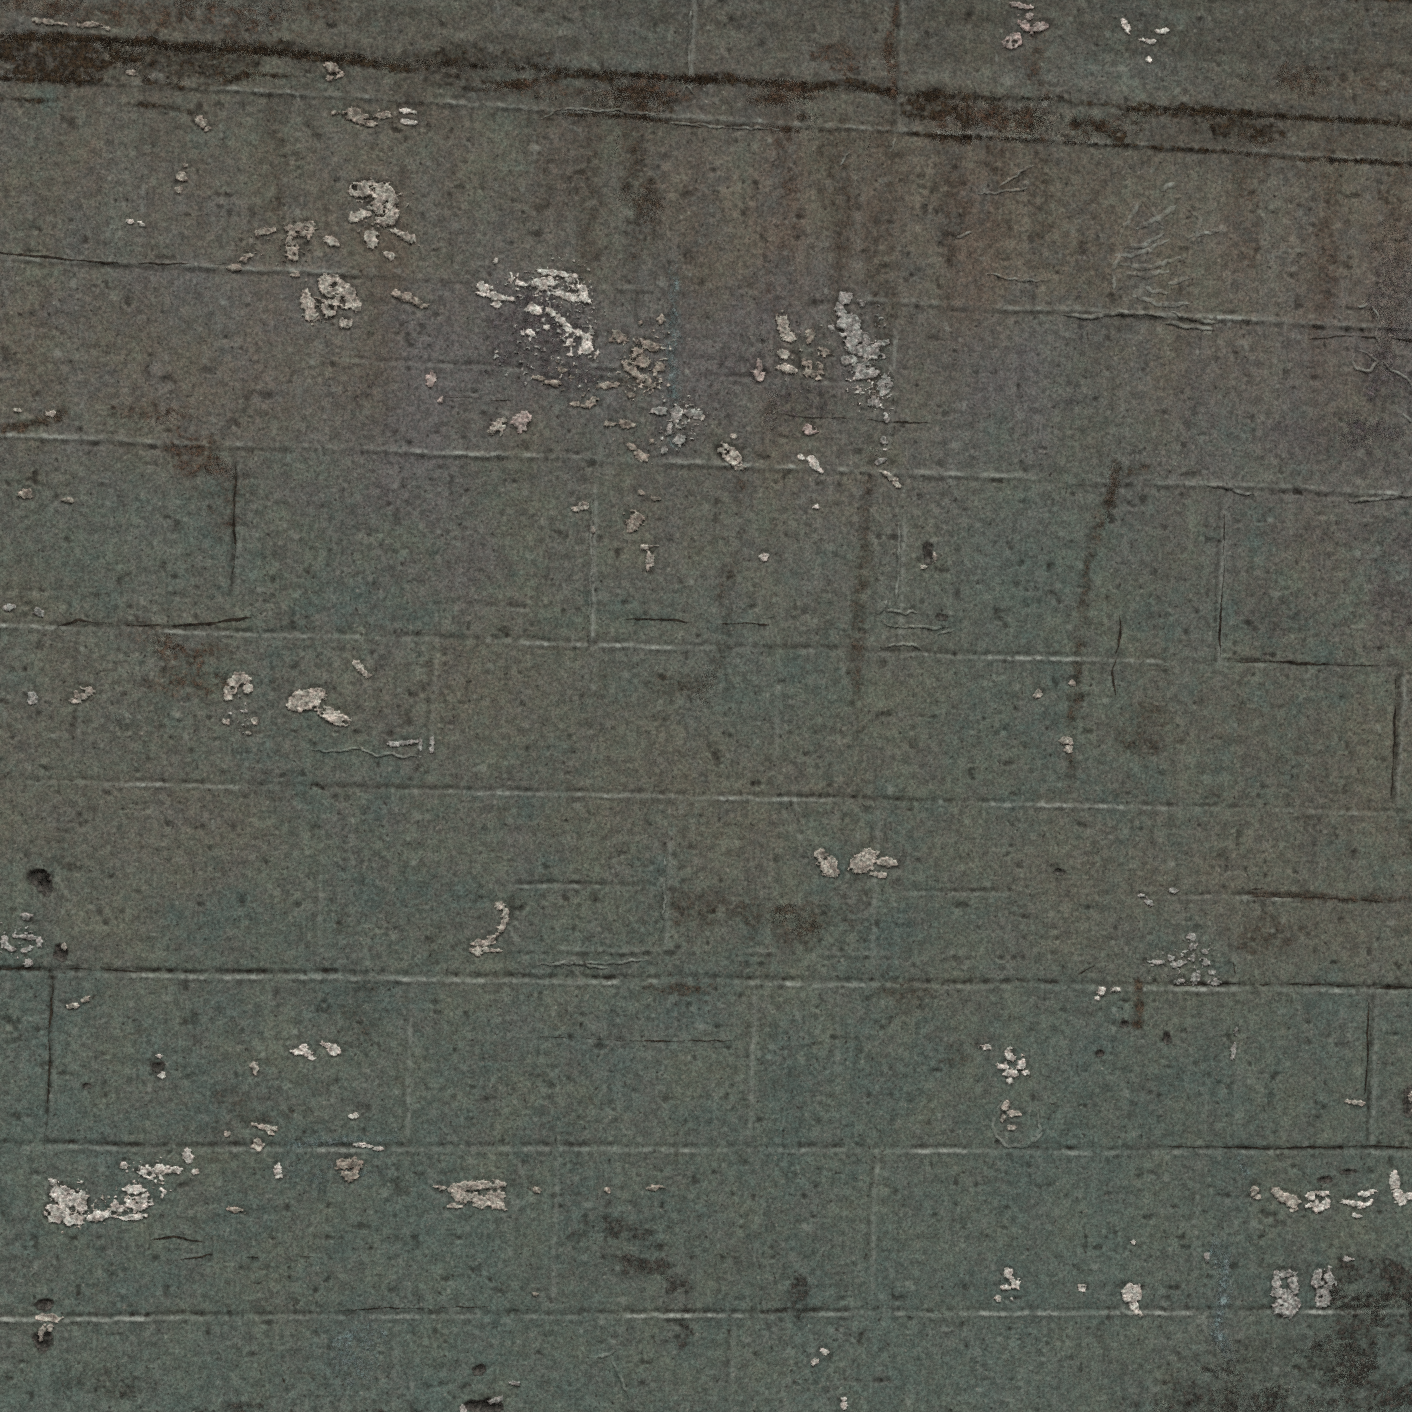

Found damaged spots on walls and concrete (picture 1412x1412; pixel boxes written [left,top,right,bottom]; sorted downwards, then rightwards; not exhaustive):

peeling [348,171,420,261]
peeling [226,221,363,329]
peeling [476,253,714,464]
peeling [751,292,902,489]
peeling [717,433,747,473]
peeling [222,671,259,736]
peeling [286,688,352,727]
peeling [814,848,898,879]
peeling [978,1044,1030,1130]
peeling [43,1147,200,1234]
peeling [1250,1169,1412,1219]
peeling [1270,1256,1355,1320]